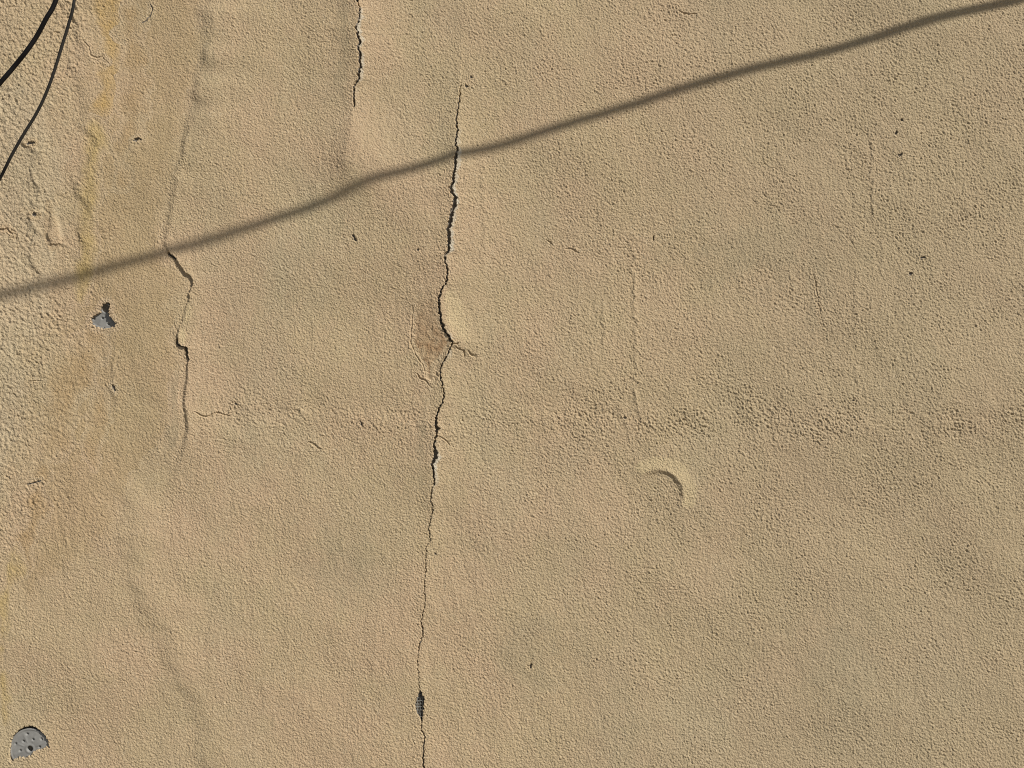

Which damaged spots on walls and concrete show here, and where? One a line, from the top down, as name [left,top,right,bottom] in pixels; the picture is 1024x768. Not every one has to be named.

crack [342,0,371,127]
spalling [85,296,122,335]
crack [405,54,482,768]
spalling [2,720,54,768]